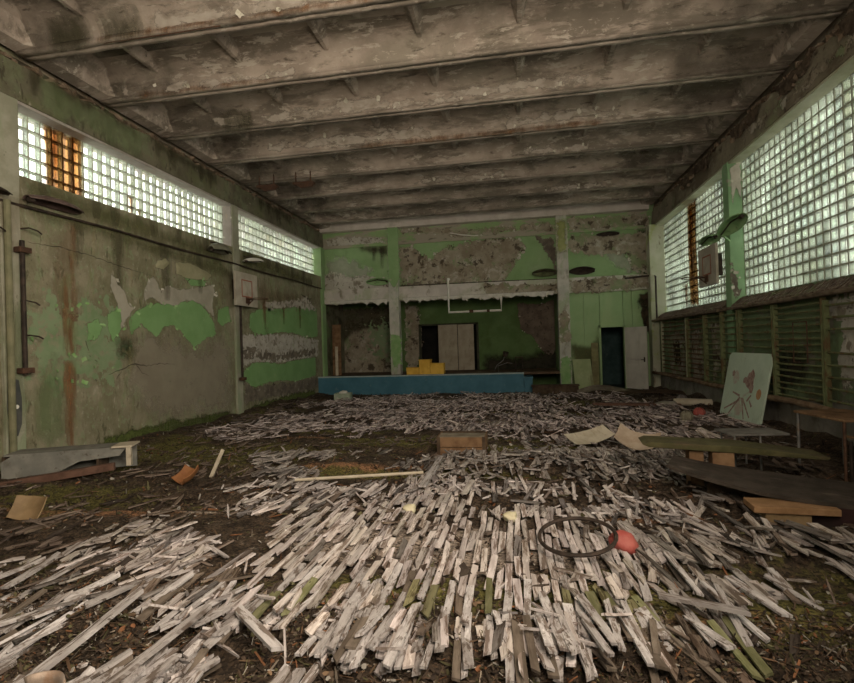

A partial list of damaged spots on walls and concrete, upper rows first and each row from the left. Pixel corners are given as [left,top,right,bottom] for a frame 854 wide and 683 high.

spalling [154,0,338,30]
peeling [730,162,743,202]
peeling [24,275,232,402]
peeling [243,296,319,388]
spalling [326,222,572,384]
spalling [568,229,649,294]
rust [685,200,699,306]
spalling [829,293,854,393]